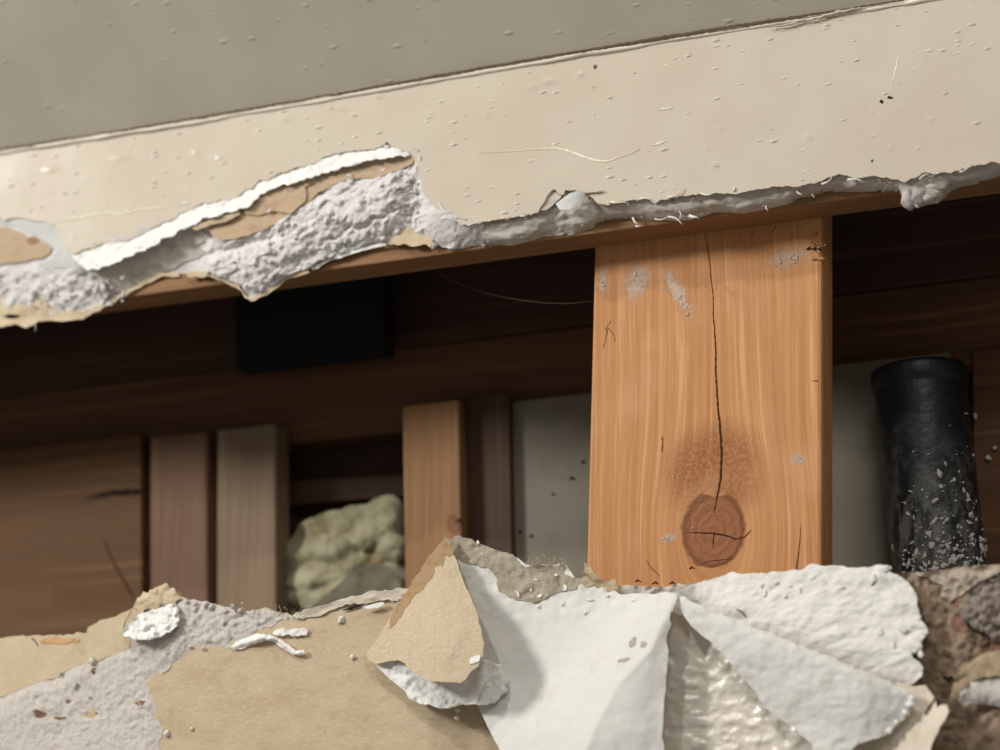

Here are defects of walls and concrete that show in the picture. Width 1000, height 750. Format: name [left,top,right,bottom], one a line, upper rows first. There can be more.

spalling [0,143,484,329]
peeling [540,190,585,211]
crack [687,235,751,564]